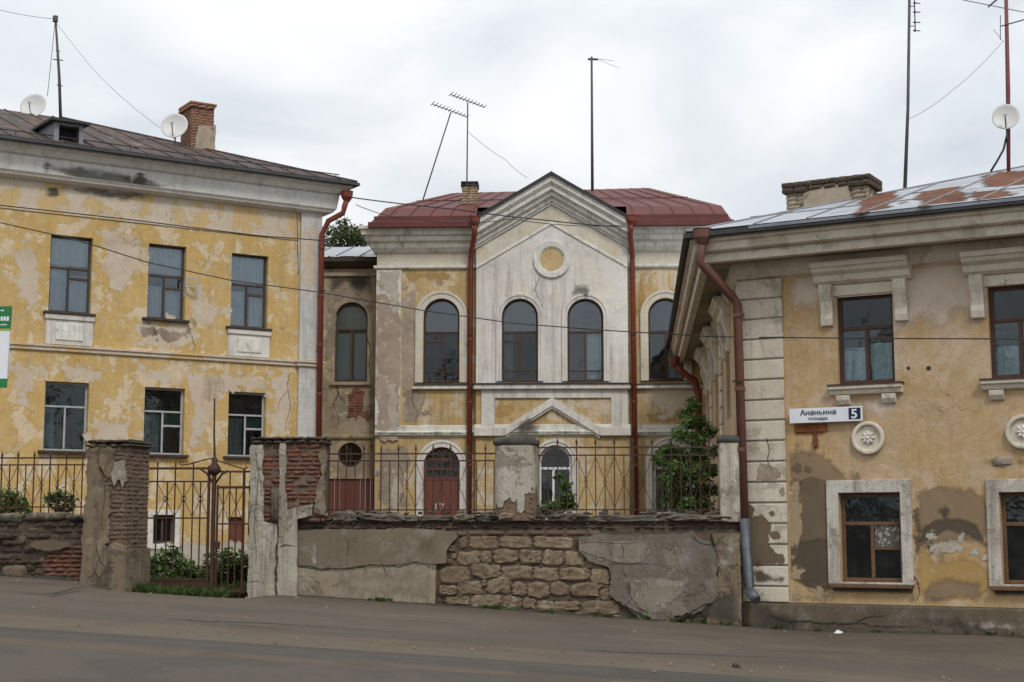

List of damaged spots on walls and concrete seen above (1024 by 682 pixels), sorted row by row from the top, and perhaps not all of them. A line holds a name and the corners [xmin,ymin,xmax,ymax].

water stain [46,164,159,198]
peeling [12,238,44,314]
peeling [96,224,150,293]
peeling [8,361,47,412]
peeling [60,362,103,383]
peeling [329,287,429,514]
peeling [135,282,328,598]
peeling [19,418,144,561]
spalling [437,445,635,616]
spalling [748,458,805,582]
peeling [910,529,989,600]